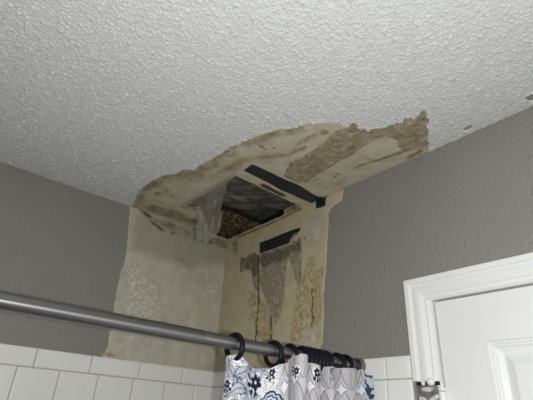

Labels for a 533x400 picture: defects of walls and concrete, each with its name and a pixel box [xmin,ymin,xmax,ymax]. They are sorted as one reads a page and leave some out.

peeling [113,110,431,349]
crack [240,256,272,341]
peeling [101,329,278,372]